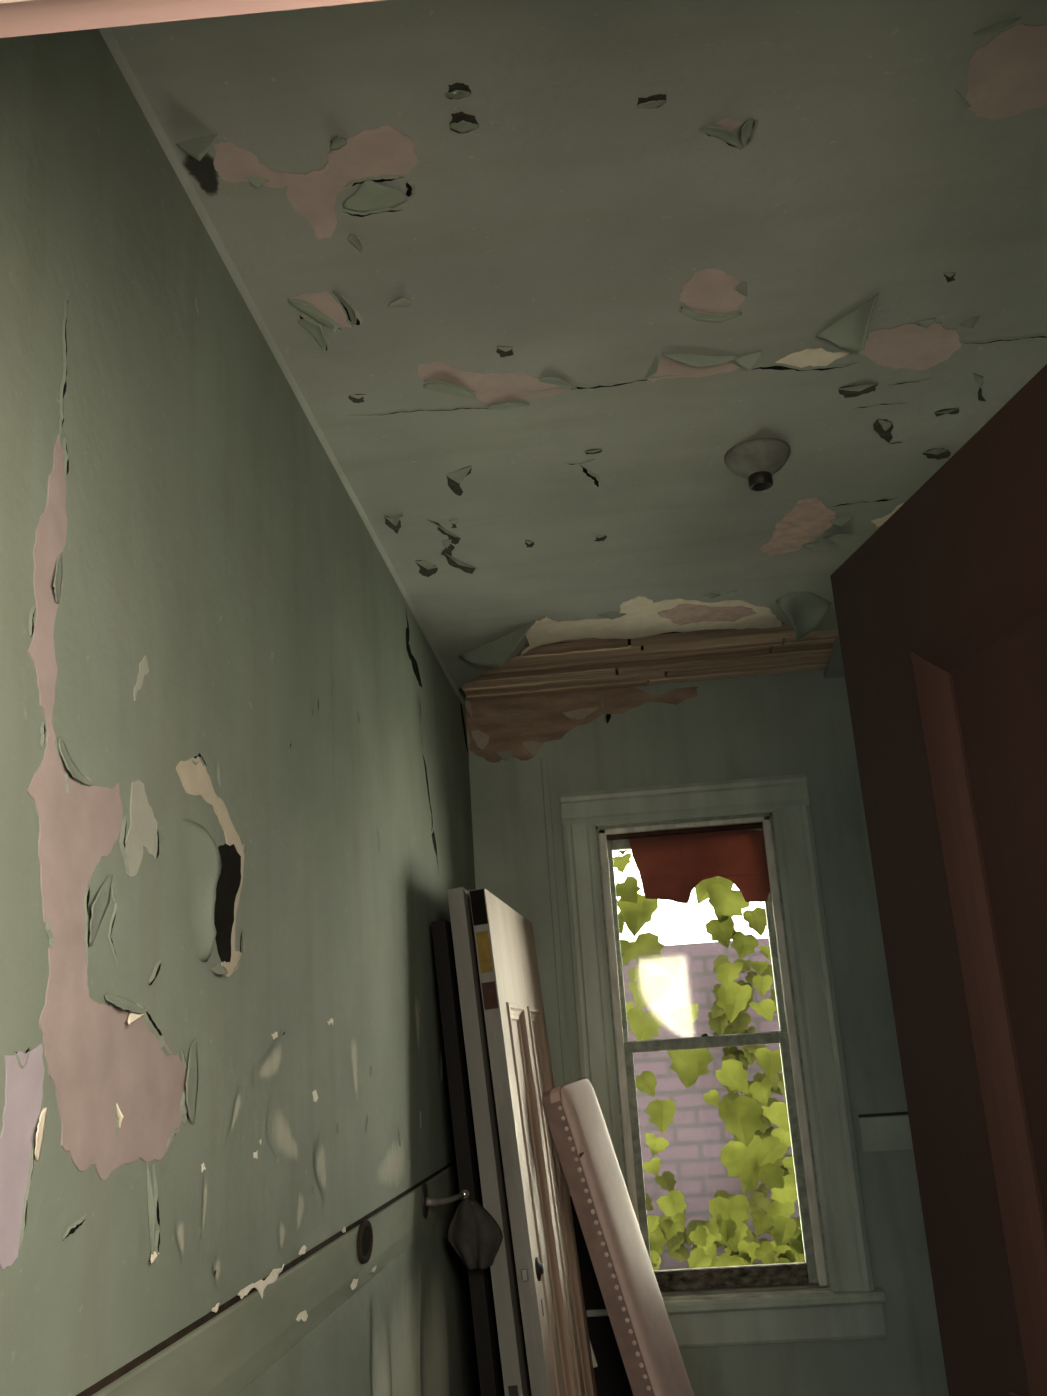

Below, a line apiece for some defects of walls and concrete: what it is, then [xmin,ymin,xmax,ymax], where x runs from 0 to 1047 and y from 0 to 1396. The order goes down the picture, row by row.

peeling [175,124,417,254]
peeling [287,290,364,353]
flaking render [679,269,747,323]
crack [350,293,1047,416]
peeling [838,376,932,444]
spalling [446,466,472,496]
spalling [565,449,603,487]
spalling [384,513,403,533]
spalling [415,519,476,577]
flaking render [758,497,904,556]
flaking render [465,686,698,763]
peeling [0,291,199,1270]